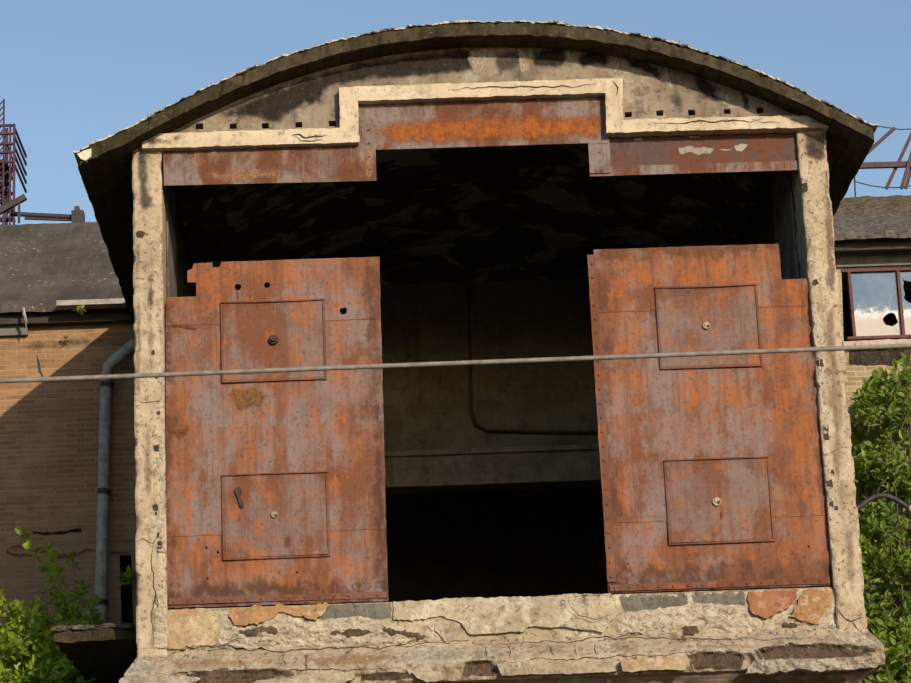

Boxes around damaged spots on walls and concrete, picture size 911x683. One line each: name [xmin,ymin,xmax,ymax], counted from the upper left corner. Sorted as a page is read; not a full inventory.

water stain [469,49,488,74]
water stain [517,49,528,73]
corrosion [385,116,598,142]
peeling [679,136,748,155]
corrosion [233,387,265,408]
crack [6,538,863,675]
spalling [125,658,154,676]